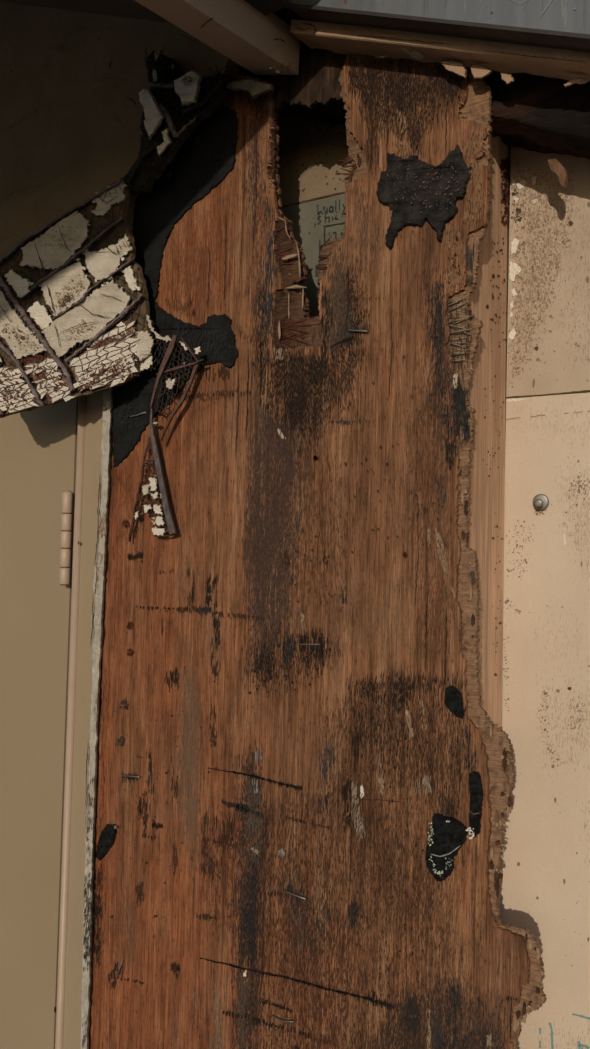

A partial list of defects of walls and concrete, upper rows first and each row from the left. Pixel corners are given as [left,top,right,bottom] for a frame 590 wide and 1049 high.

crack [0,242,123,346]
water stain [483,157,590,477]
water stain [492,513,534,587]
water stain [554,462,590,591]